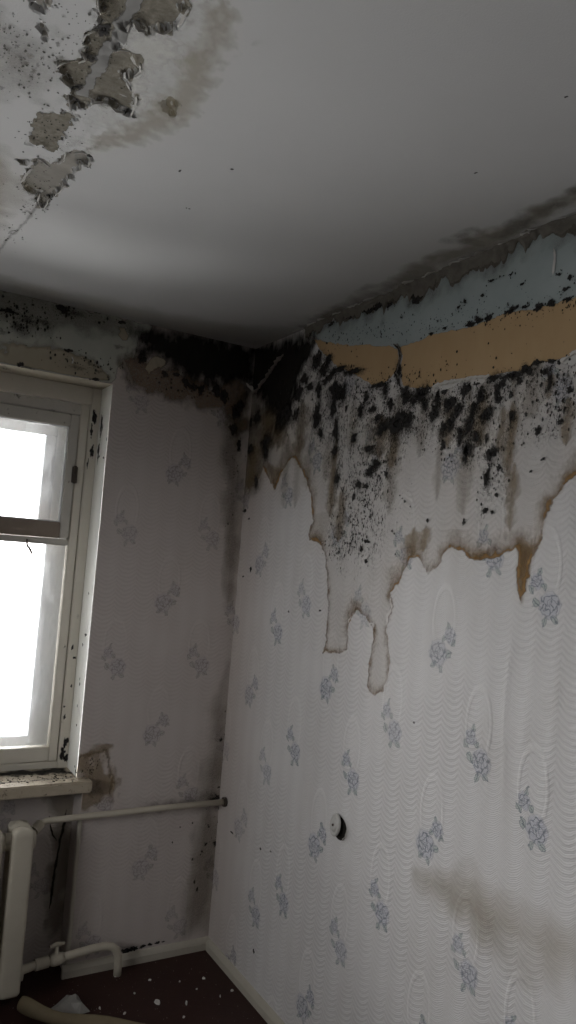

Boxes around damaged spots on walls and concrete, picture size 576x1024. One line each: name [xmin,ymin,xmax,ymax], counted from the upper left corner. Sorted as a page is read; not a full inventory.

spalling [15,0,192,215]
leakage [120,32,174,107]
leakage [0,269,576,644]